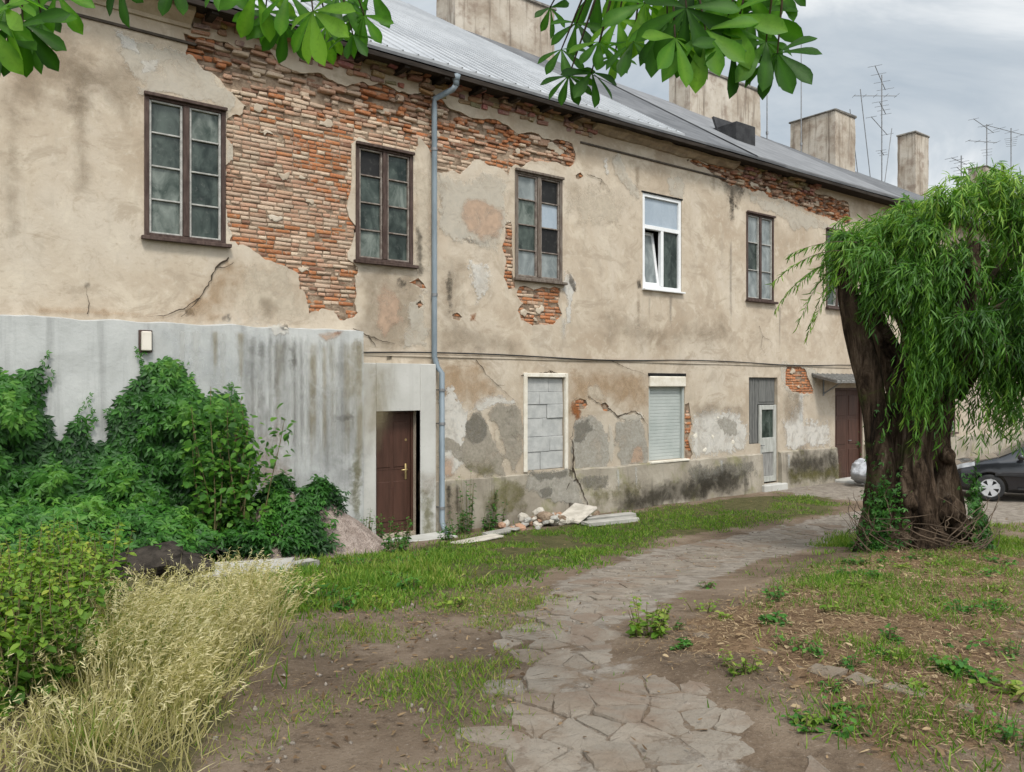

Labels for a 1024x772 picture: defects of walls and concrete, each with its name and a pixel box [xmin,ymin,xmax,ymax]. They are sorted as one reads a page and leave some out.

flaking render [116,31,583,325]
flaking render [690,160,851,231]
crack [147,257,233,317]
flaking render [438,385,515,478]
crack [566,433,588,505]
crack [588,396,649,440]
damp [624,408,754,510]
flaking render [780,361,830,450]
damp [791,451,837,479]